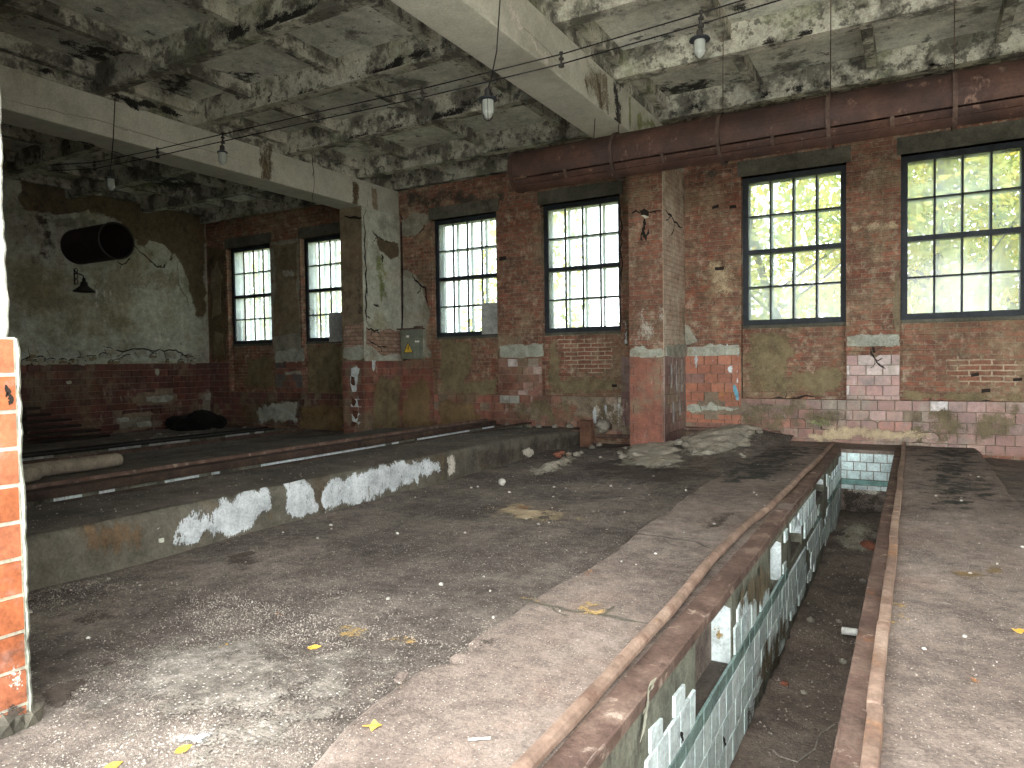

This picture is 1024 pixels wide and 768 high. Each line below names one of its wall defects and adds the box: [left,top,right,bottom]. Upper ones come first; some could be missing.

mould [221,2,316,42]
mould [353,39,453,79]
mould [108,93,182,117]
mould [334,99,481,139]
crack [619,207,683,286]
peeling [18,181,228,376]
crack [103,346,194,357]
peeling [343,276,427,427]
peeling [500,345,543,359]
crack [870,349,885,369]
spalling [943,351,1024,393]
spalling [22,401,299,461]